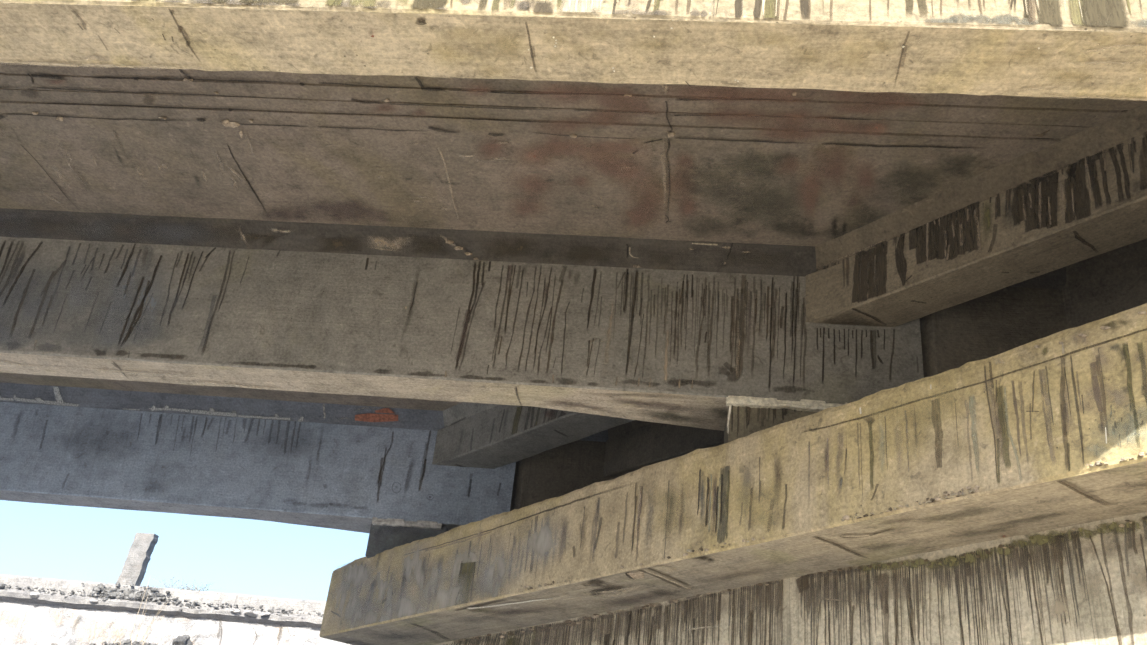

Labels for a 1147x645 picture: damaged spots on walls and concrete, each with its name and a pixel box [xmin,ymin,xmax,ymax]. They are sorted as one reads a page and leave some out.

leakage [412,0,452,9]
leakage [545,0,620,14]
leakage [735,0,833,18]
crack [632,87,675,222]
leakage [0,222,69,339]
leakage [30,225,249,356]
leakage [123,405,304,422]
leakage [377,432,394,501]
leakage [623,488,643,555]
leakage [697,466,730,543]
leakage [447,516,1147,645]